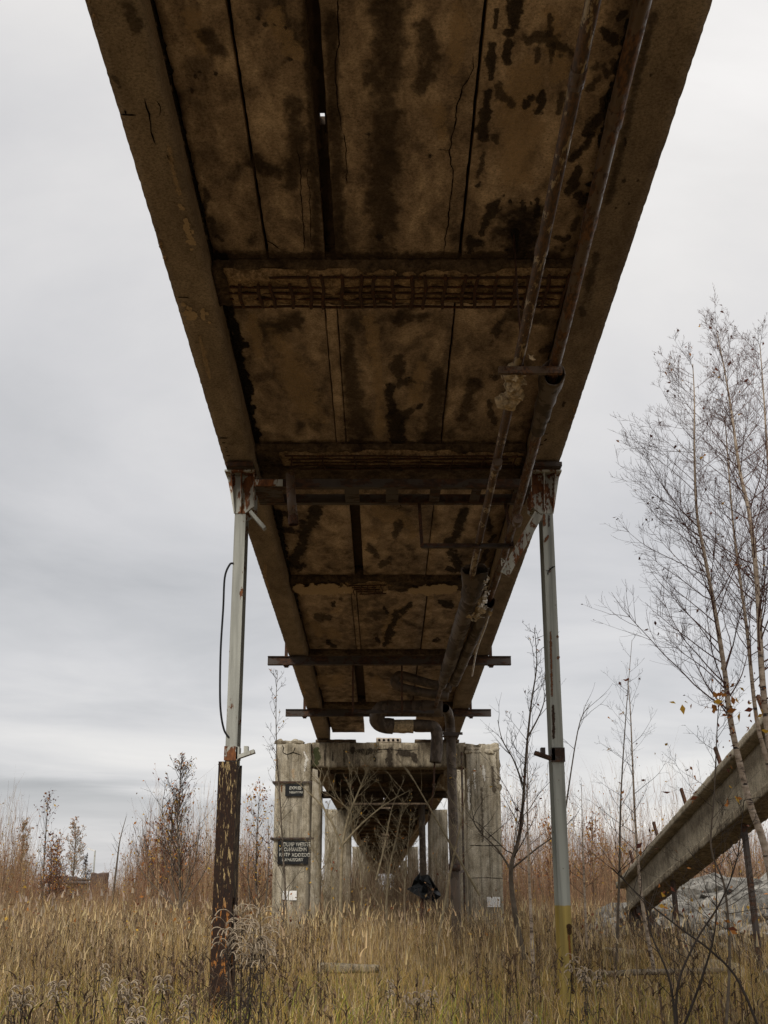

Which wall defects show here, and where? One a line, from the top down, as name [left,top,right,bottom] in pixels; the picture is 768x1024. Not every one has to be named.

leakage [203,0,628,260]
crack [438,63,474,249]
leakage [605,13,657,204]
spalling [223,267,571,310]
leakage [384,354,447,444]
leakage [278,505,323,572]
spalling [292,581,393,596]
spalling [407,584,458,596]
leakage [375,601,413,647]